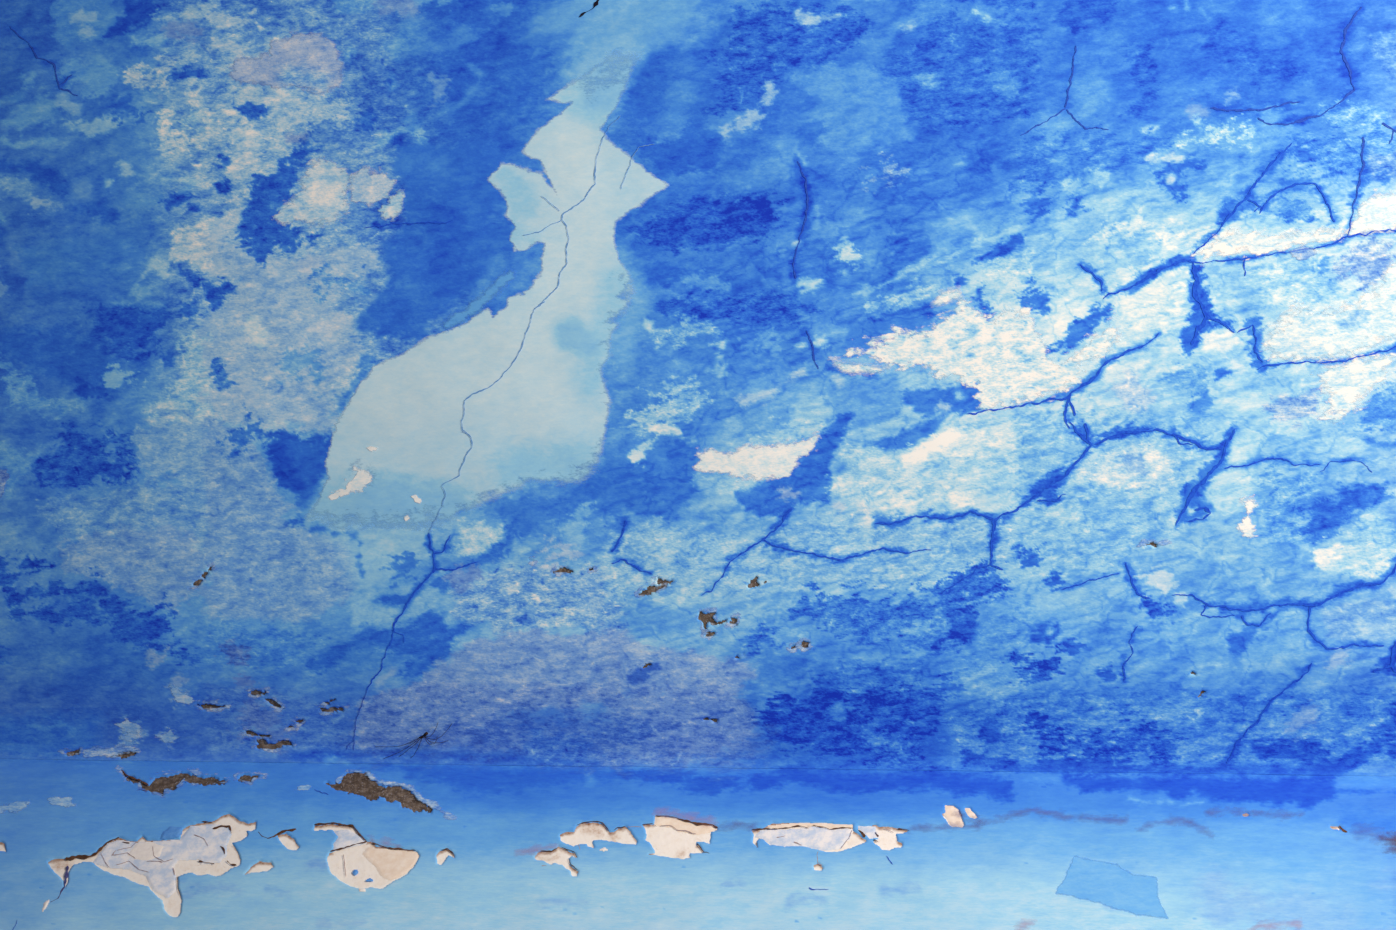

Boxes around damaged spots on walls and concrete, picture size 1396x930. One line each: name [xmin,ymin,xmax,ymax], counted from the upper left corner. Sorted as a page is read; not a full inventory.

crack [1022,46,1109,135]
crack [793,161,809,278]
crack [1080,6,1396,369]
crack [346,115,653,750]
crack [701,330,1372,596]
crack [1062,564,1396,763]
spalling [58,744,267,797]
peeling [42,814,299,917]
peeling [314,822,419,892]
spalling [326,769,457,820]
peeling [535,815,718,876]
peeling [752,823,907,871]